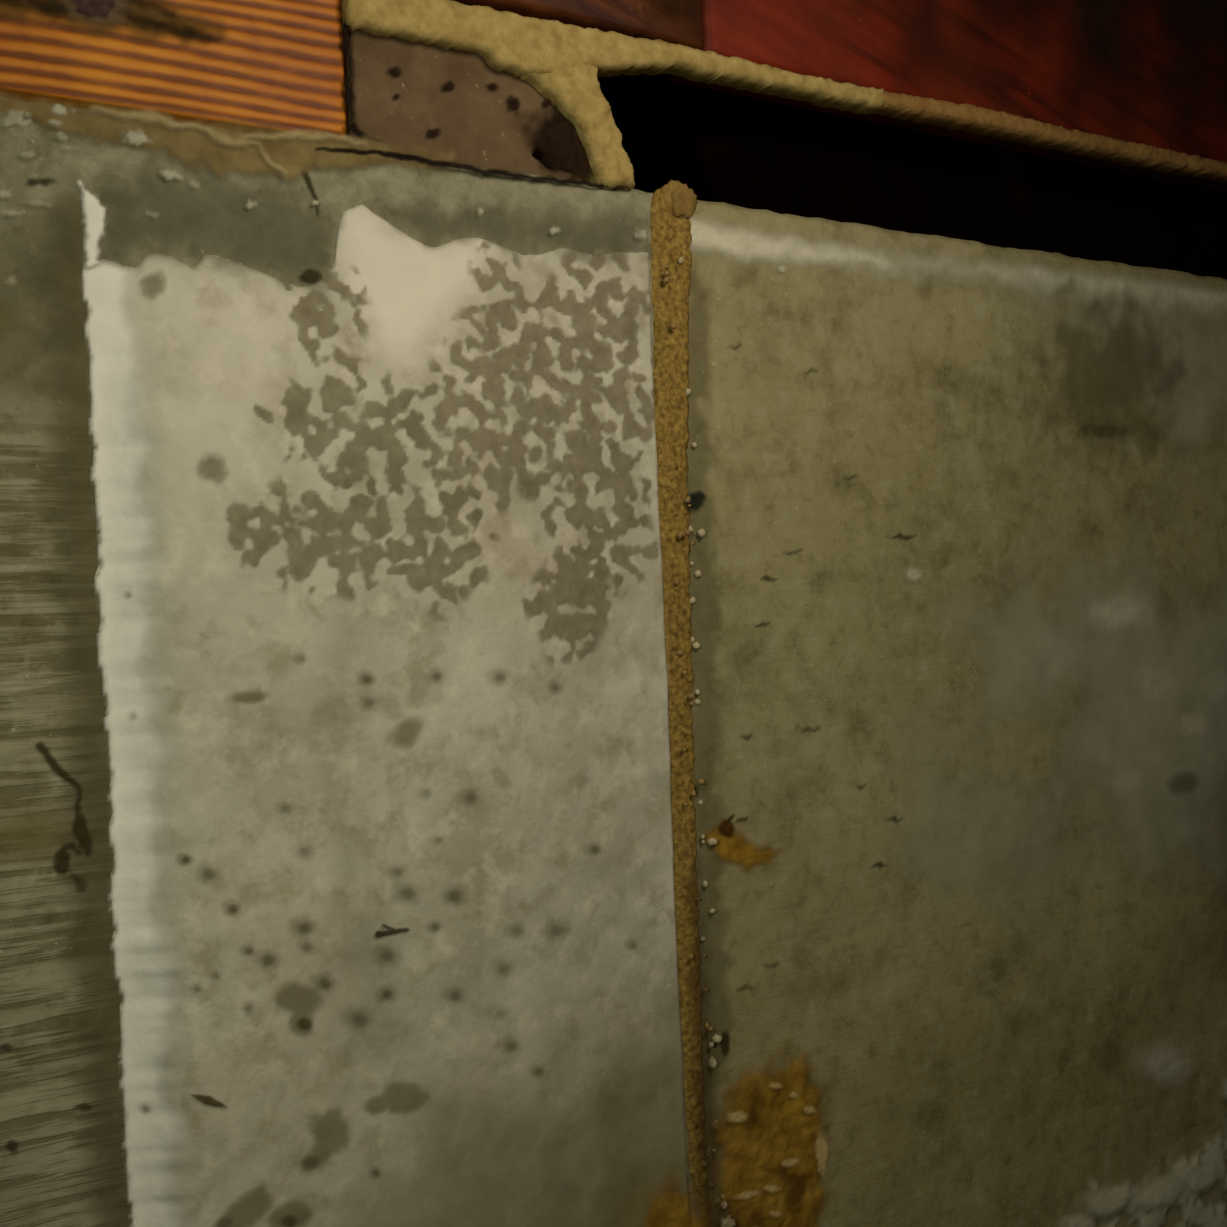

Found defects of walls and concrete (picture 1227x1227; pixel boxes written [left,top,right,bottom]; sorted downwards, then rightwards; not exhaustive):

crack [302,21,628,214]
peeling [144,276,162,295]
peeling [201,458,223,478]
peeling [227,243,658,659]
crack [37,743,91,873]
rust [705,815,775,869]
leakage [279,985,318,1033]
leakage [368,1086,422,1111]
leakage [304,1112,345,1167]
rust [646,1059,827,1227]
leakage [221,1189,308,1227]
efflorescence [1064,1134,1227,1227]